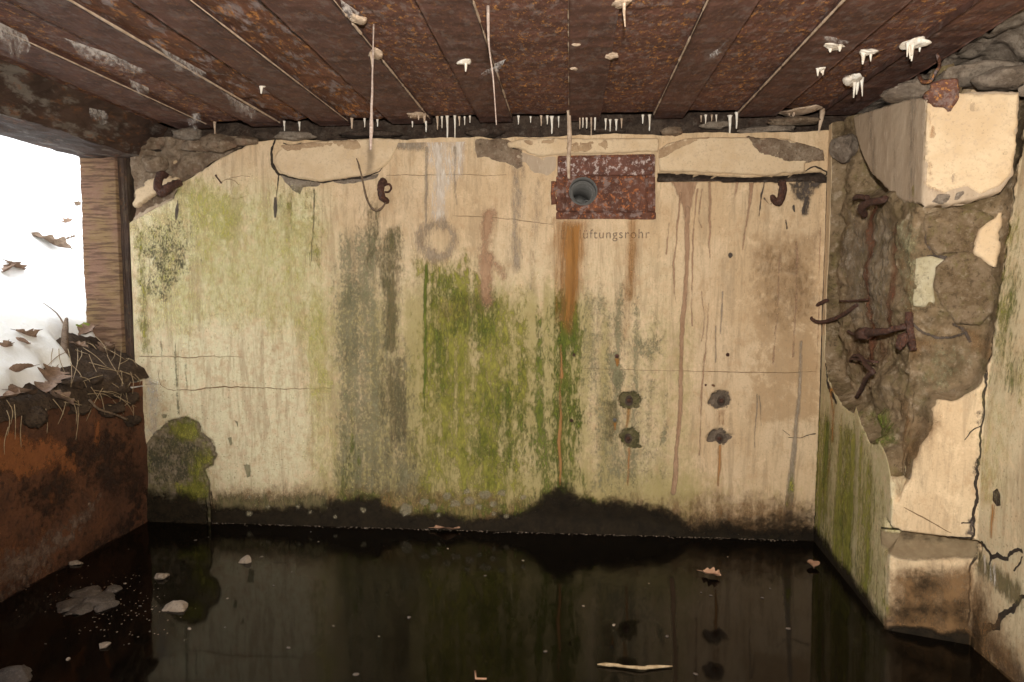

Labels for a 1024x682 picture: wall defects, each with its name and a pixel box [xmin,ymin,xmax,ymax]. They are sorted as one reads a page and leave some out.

leakage [824,43,845,53]
leakage [842,48,879,98]
leakage [899,36,932,61]
spalling [130,133,275,221]
rust [558,222,583,330]
spalling [657,83,1024,479]
crack [139,356,330,391]
rust [0,430,78,481]
leakage [145,176,1017,681]
crack [881,284,1024,642]